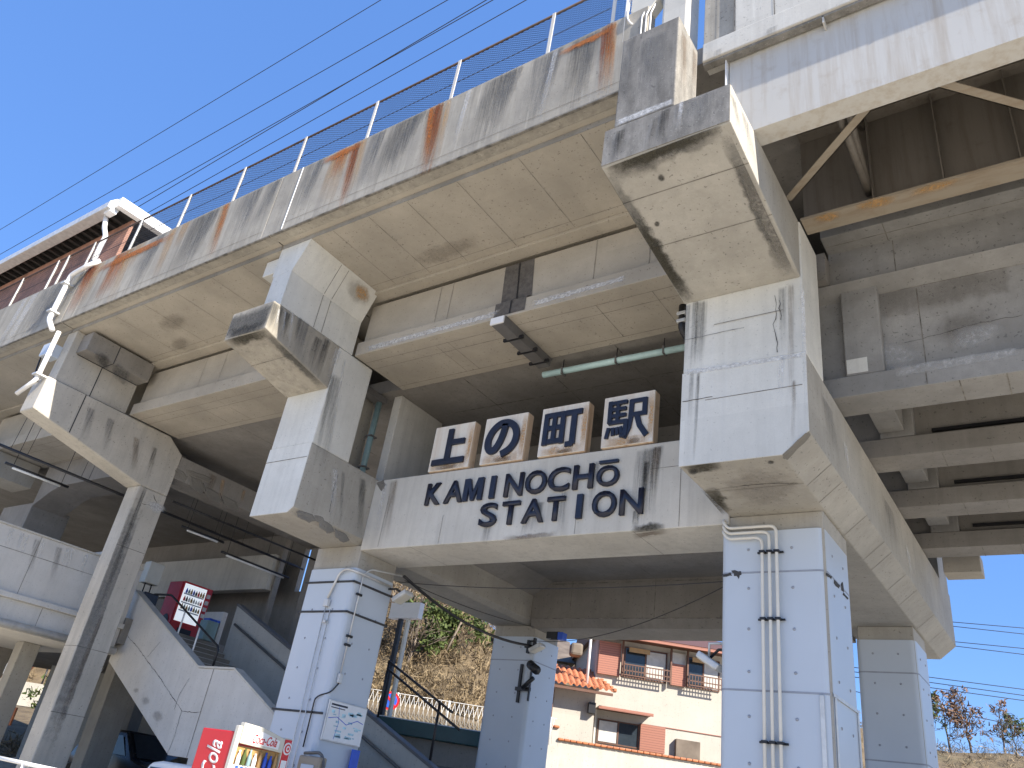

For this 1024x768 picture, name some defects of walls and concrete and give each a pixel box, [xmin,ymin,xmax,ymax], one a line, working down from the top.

corrosion [567,25,614,61]
corrosion [427,104,445,152]
corrosion [328,141,364,182]
water stain [624,132,703,168]
water stain [740,171,783,254]
water stain [622,202,683,291]
corrosion [78,241,160,295]
spalling [296,510,349,543]
water stain [636,524,659,536]